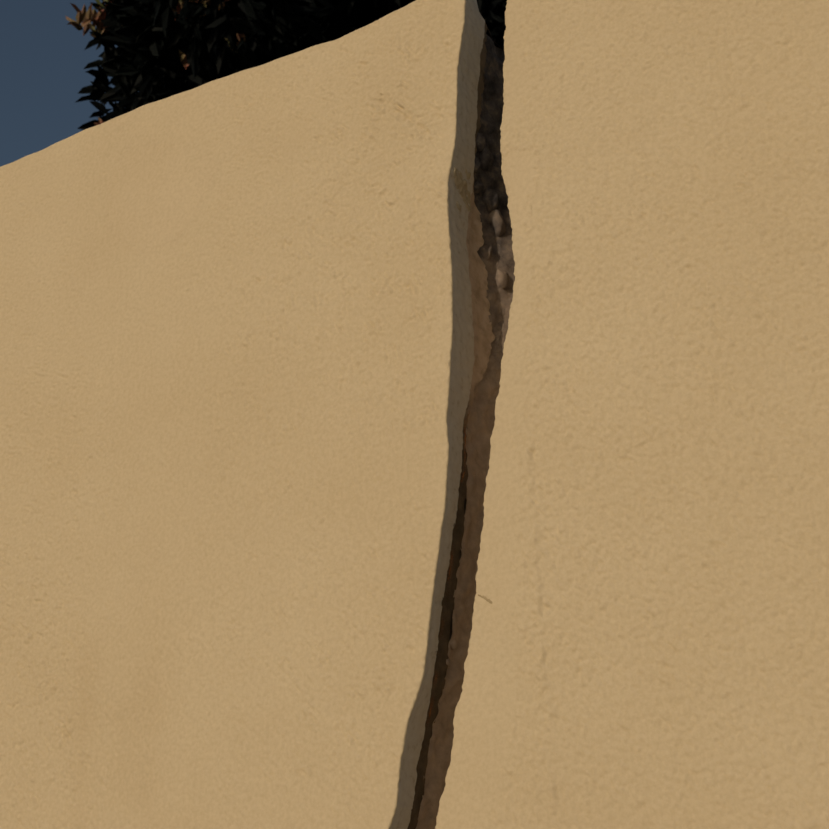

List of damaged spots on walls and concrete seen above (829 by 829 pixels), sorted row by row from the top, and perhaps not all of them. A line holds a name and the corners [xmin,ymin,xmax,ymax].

crack [390,0,515,829]